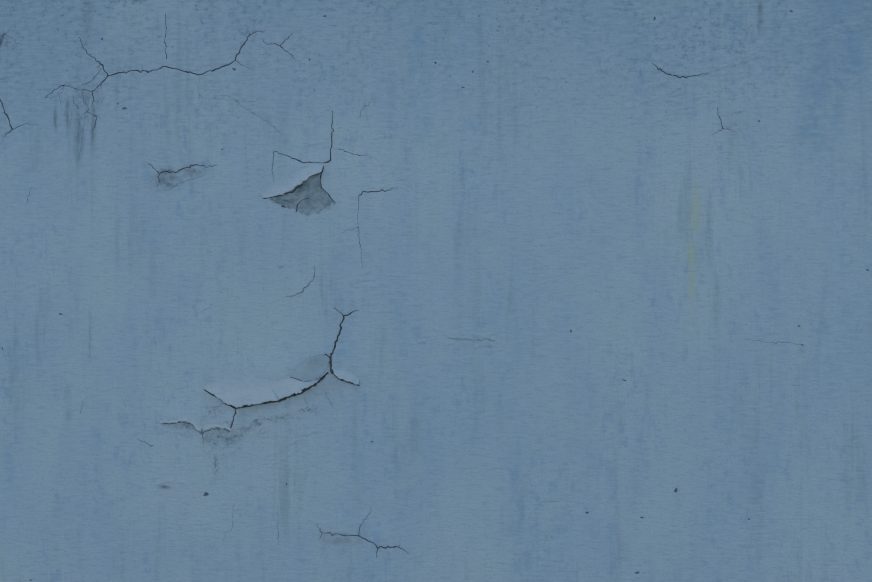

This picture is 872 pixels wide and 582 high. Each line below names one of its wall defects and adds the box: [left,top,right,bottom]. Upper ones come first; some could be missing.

crack [0,79,33,138]
crack [45,14,295,151]
crack [652,63,709,78]
peeling [259,111,339,221]
crack [343,188,392,264]
peeling [157,308,359,455]
crack [317,508,409,557]